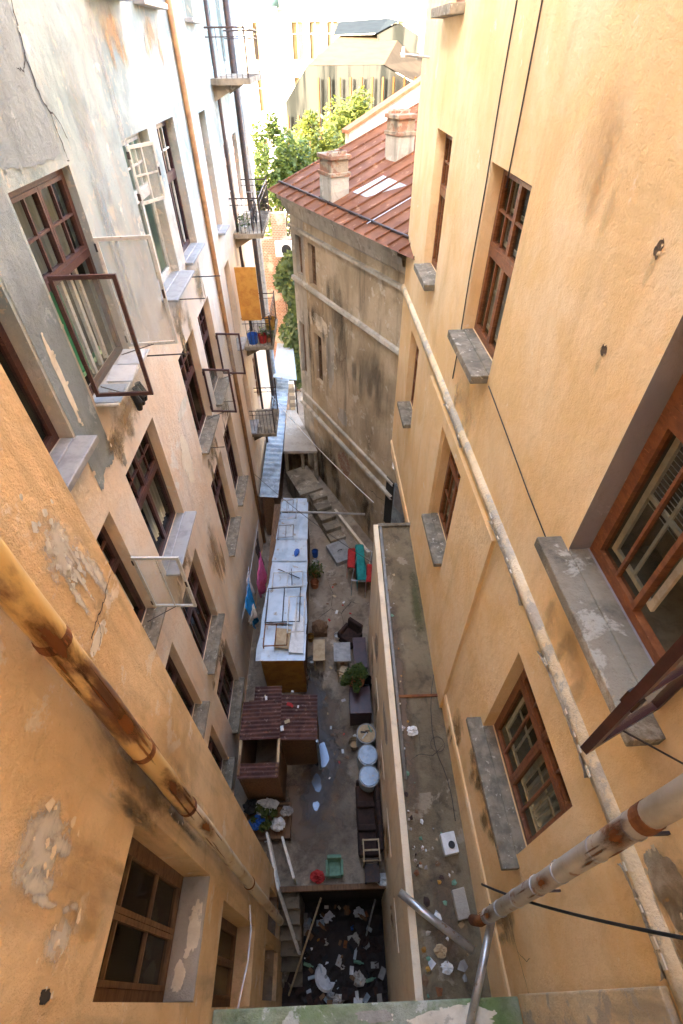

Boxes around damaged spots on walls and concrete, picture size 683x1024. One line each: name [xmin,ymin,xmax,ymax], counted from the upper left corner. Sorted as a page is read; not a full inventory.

crack [11,0,69,161]
flaking render [0,186,128,491]
flaking render [90,619,107,657]
crack [91,575,111,647]
corrosion [25,620,157,760]
peeling [13,798,81,964]
corrosion [583,820,629,867]
flaking render [171,899,203,992]
damp [673,939,683,963]